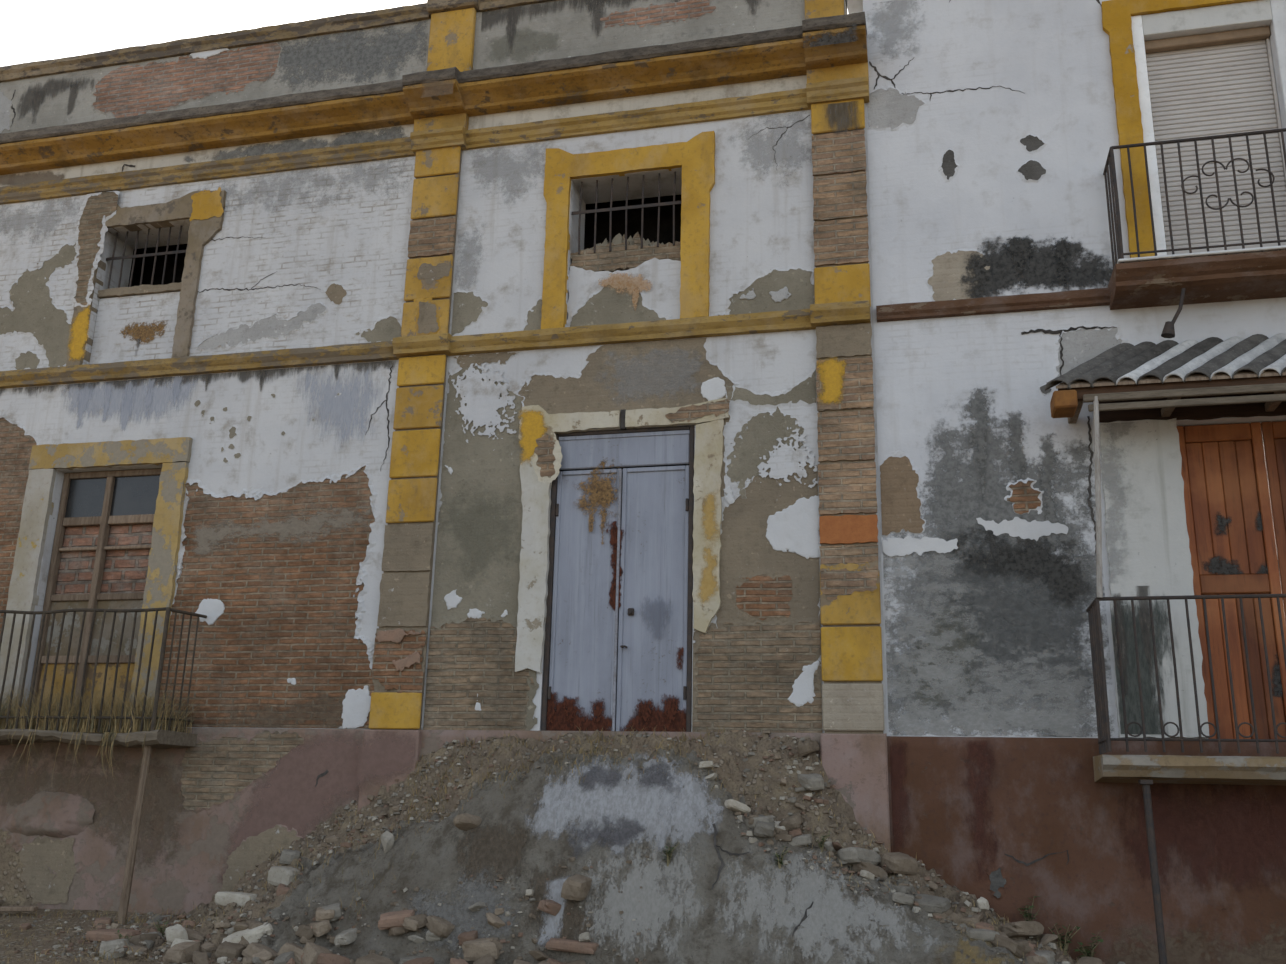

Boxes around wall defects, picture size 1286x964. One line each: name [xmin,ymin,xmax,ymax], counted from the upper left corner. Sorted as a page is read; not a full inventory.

crack [869,59,1023,99]
crack [747,115,809,170]
spalling [1016,133,1047,183]
spalling [0,191,119,370]
crack [198,272,321,293]
mould [961,236,1113,298]
corrosion [120,321,167,348]
flaking render [0,410,41,635]
flaking render [157,337,879,733]
corrosion [578,461,624,610]
damp [883,389,1171,874]
corrosion [546,692,686,732]